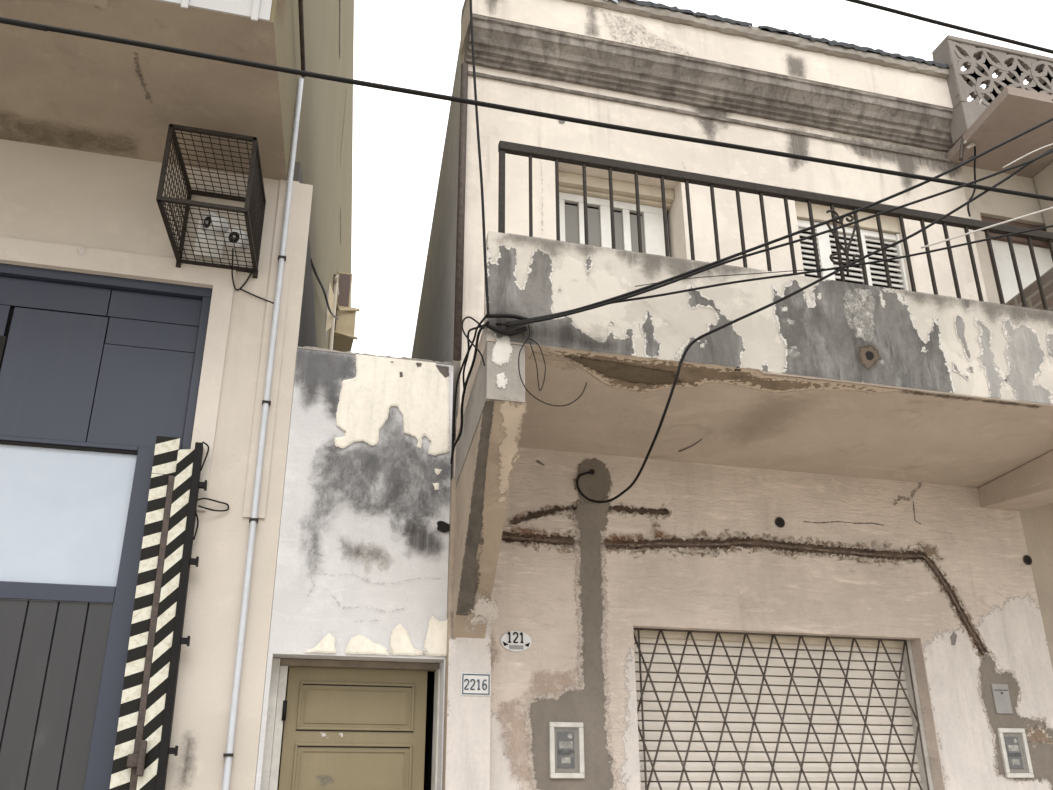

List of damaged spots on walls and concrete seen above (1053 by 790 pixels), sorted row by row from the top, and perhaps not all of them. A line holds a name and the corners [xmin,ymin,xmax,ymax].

damp [788,57,803,77]
damp [295,348,356,414]
damp [317,410,451,552]
peeling [334,354,450,490]
peeling [485,244,1053,503]
damp [350,546,380,558]
peeling [305,615,447,656]
crack [475,483,999,667]